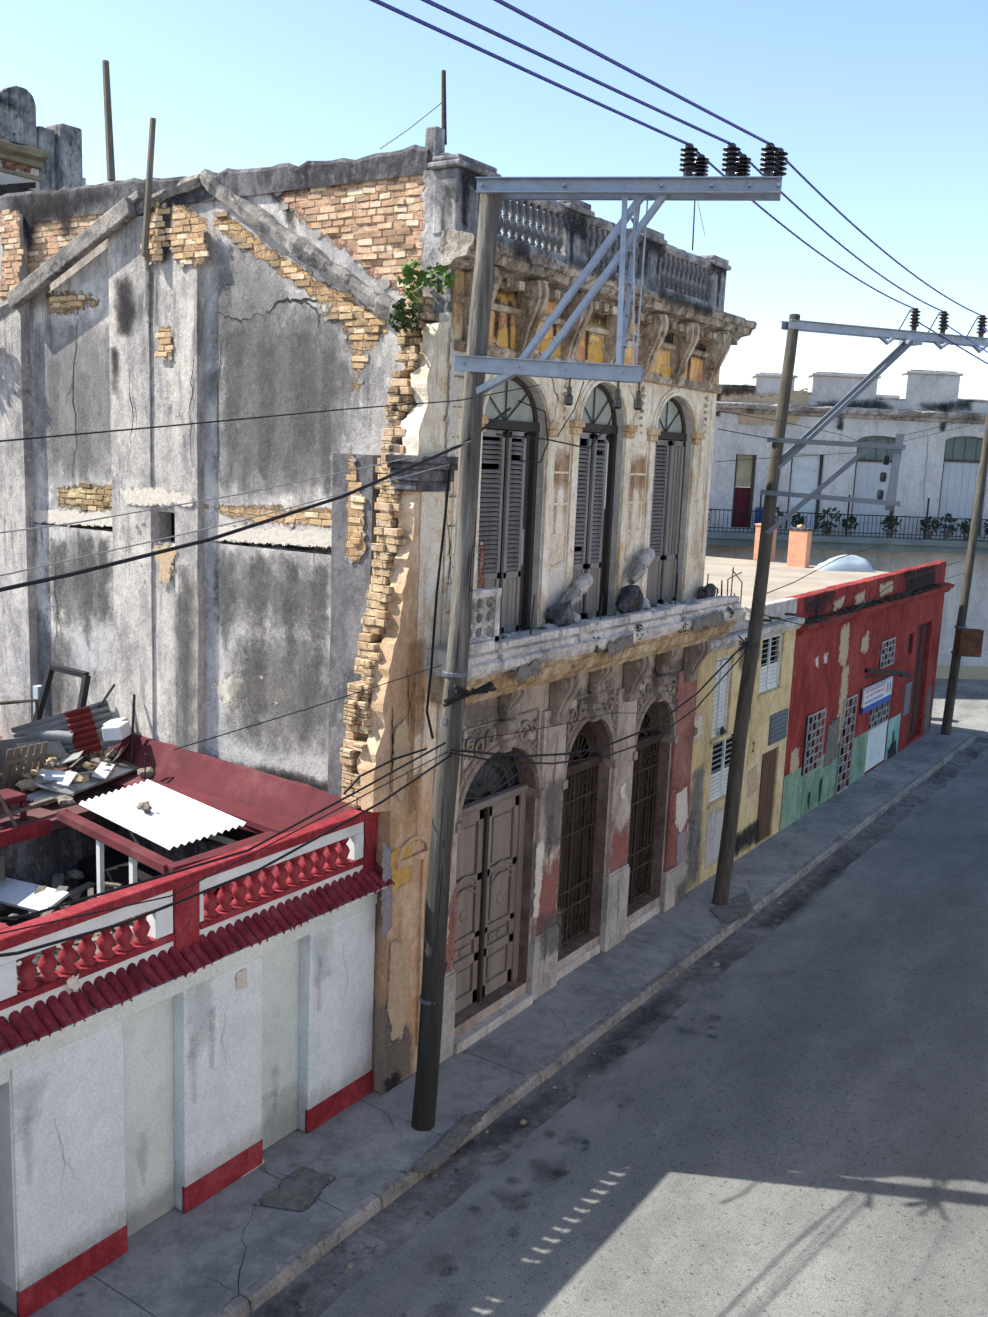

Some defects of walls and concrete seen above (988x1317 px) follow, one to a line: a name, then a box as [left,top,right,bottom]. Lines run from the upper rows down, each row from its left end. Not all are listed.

crack [174,297,320,485]
spalling [34,174,462,808]
damp [37,540,114,717]
damp [173,514,329,772]
peeling [815,581,893,746]
flaking render [380,842,414,1041]
peeling [533,839,545,919]
damp [675,768,760,904]
peeling [790,747,800,774]